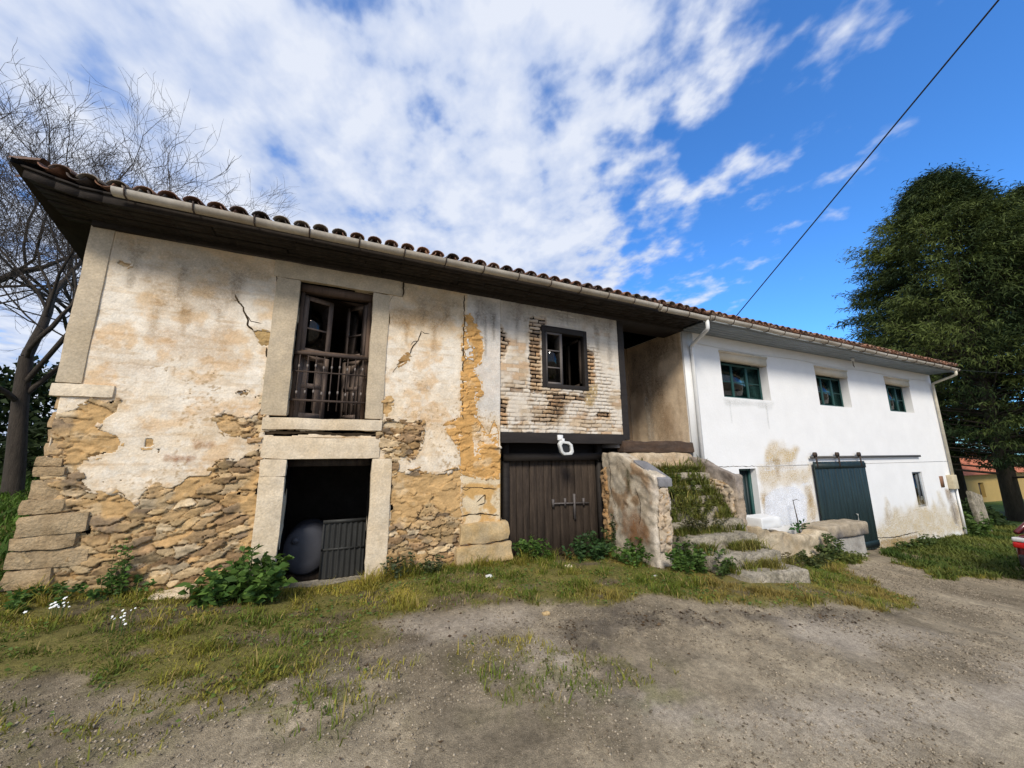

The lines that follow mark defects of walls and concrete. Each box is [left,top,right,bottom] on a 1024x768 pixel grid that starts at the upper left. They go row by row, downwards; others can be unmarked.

crack [235,295,268,357]
spalling [528,316,586,424]
spalling [587,352,596,386]
spalling [20,389,267,592]
spalling [375,313,510,573]
water stain [763,447,815,525]